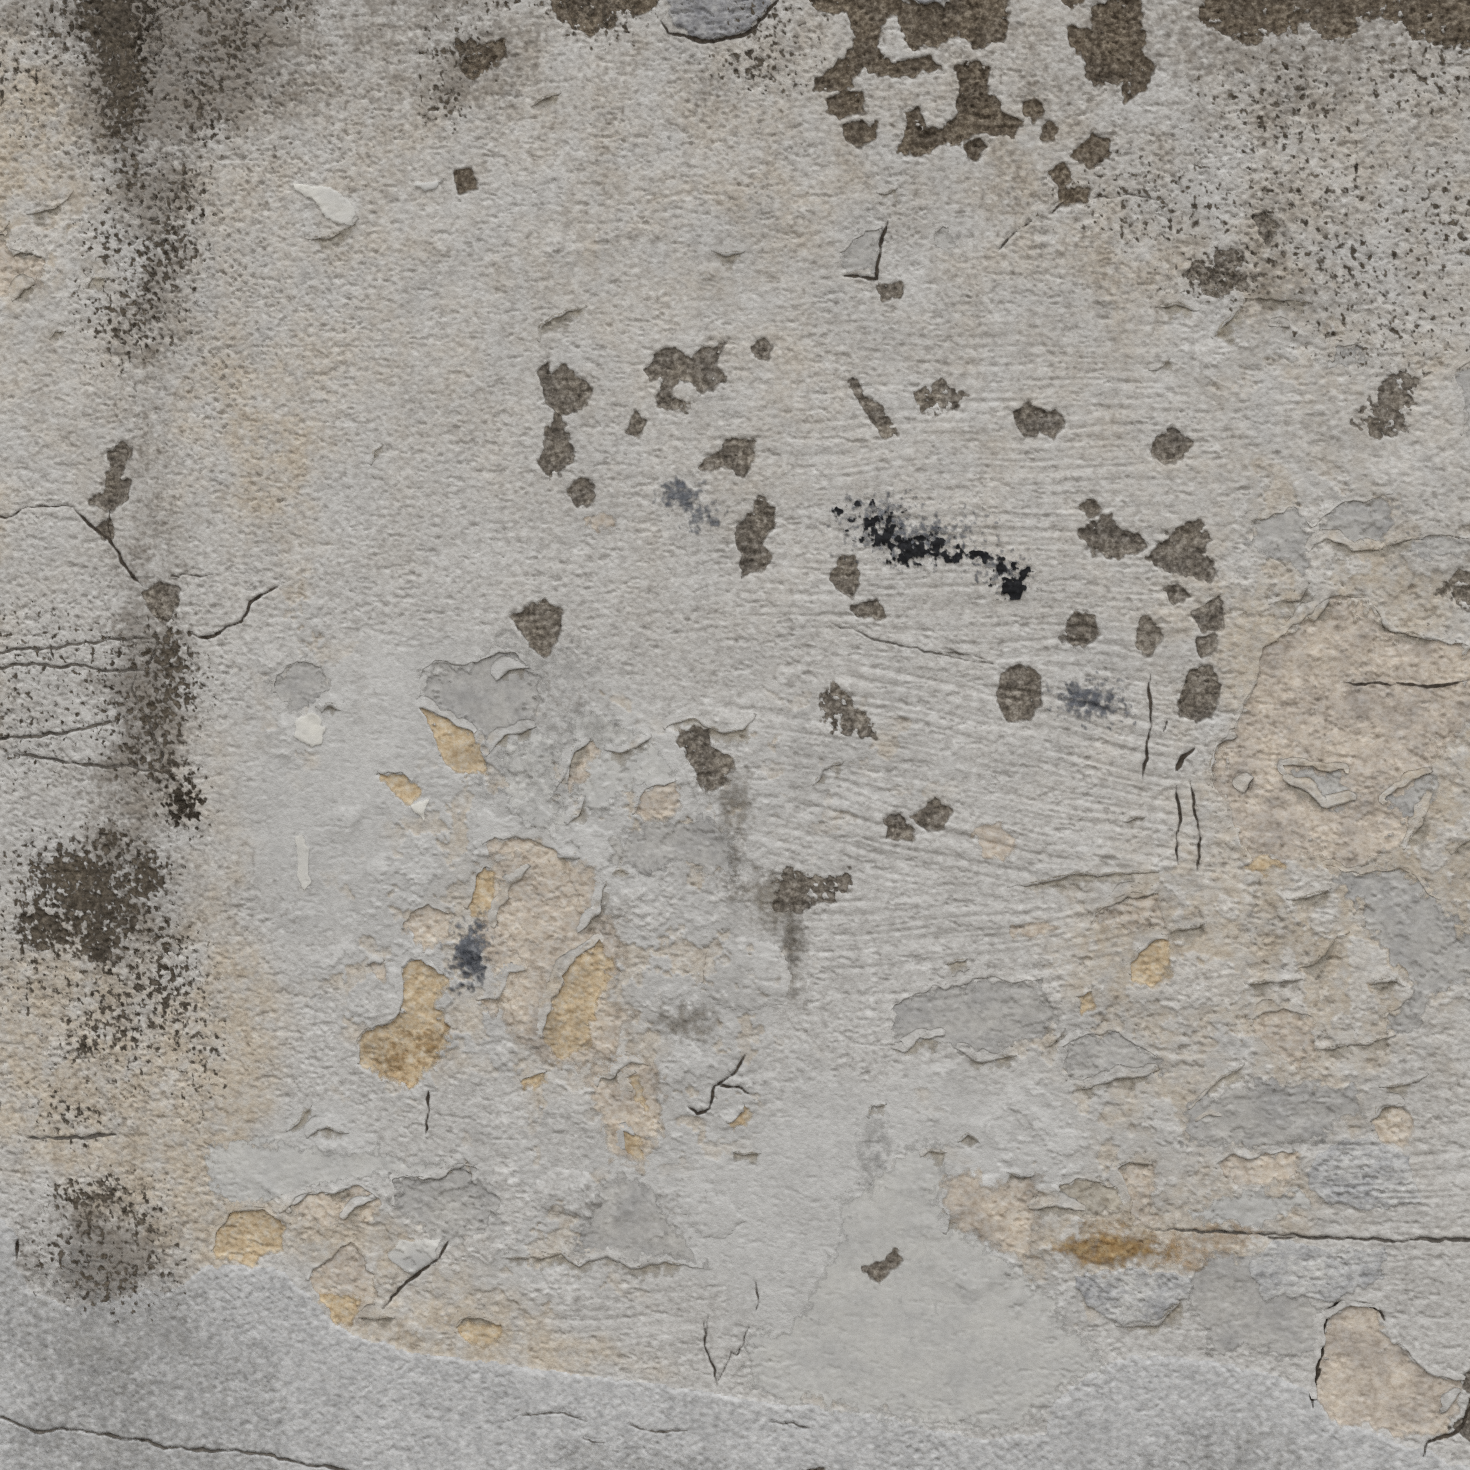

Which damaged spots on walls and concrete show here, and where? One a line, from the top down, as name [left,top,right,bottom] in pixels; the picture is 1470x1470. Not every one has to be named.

spalling [809,0,1059,161]
spalling [1061,0,1155,104]
spalling [1198,0,1470,49]
crack [0,505,208,582]
crack [193,586,277,639]
crack [0,636,164,771]
crack [1142,675,1201,867]
leakage [0,601,229,1151]
peeling [349,599,756,1175]
peeling [1077,491,1470,1229]
leakage [25,1164,192,1394]
crack [0,1416,345,1470]